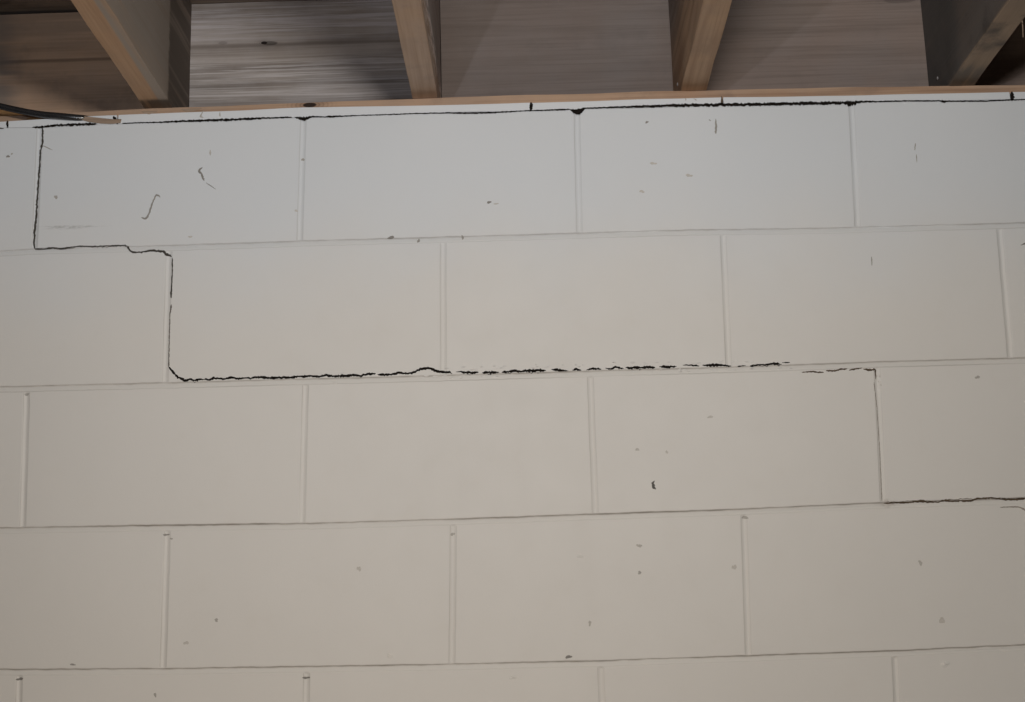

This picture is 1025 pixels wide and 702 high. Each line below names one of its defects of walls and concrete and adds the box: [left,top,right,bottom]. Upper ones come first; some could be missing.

crack [123,99,1025,124]
crack [32,122,1025,511]